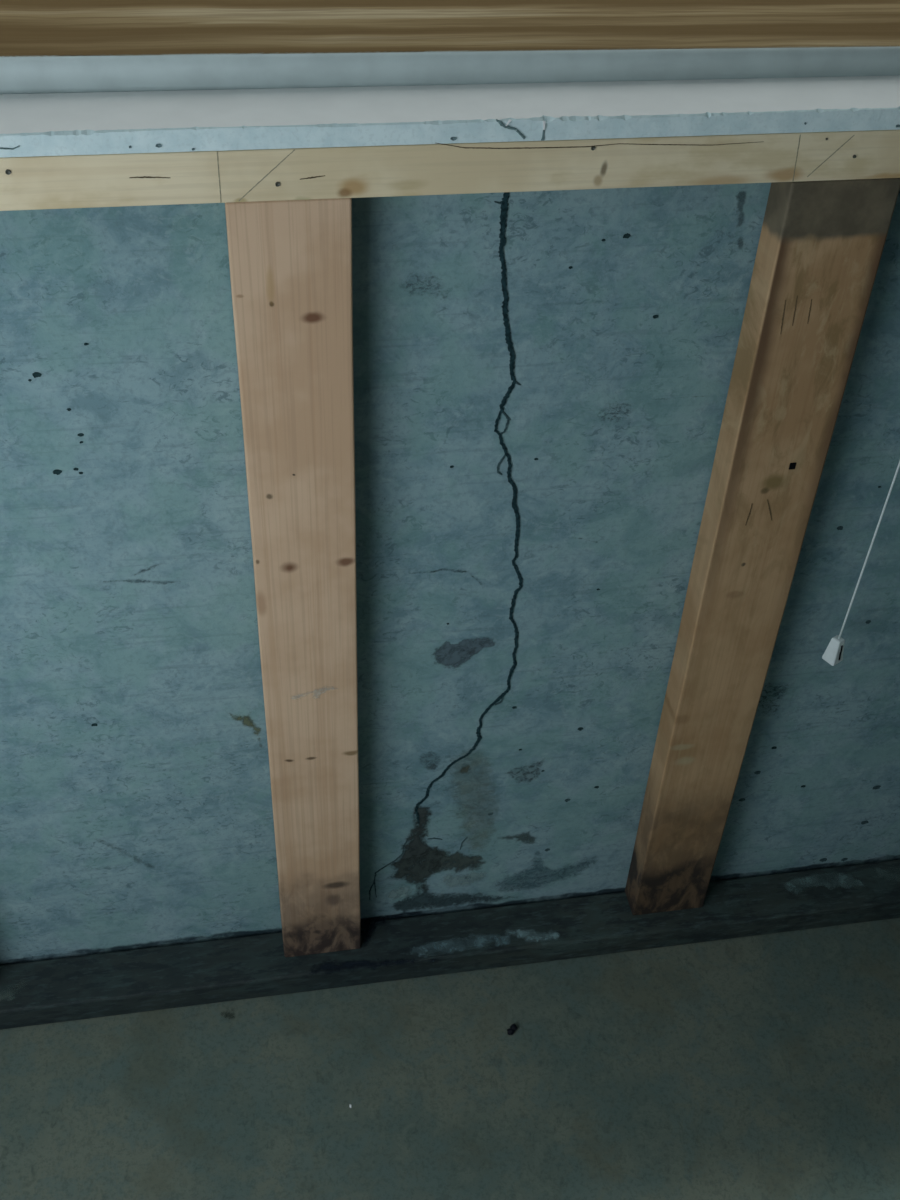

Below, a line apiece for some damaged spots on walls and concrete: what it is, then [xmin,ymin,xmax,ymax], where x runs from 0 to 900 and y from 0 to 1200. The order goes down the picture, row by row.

crack [496,119,525,139]
crack [369,192,523,900]
water stain [361,807,589,943]
water stain [305,929,559,977]